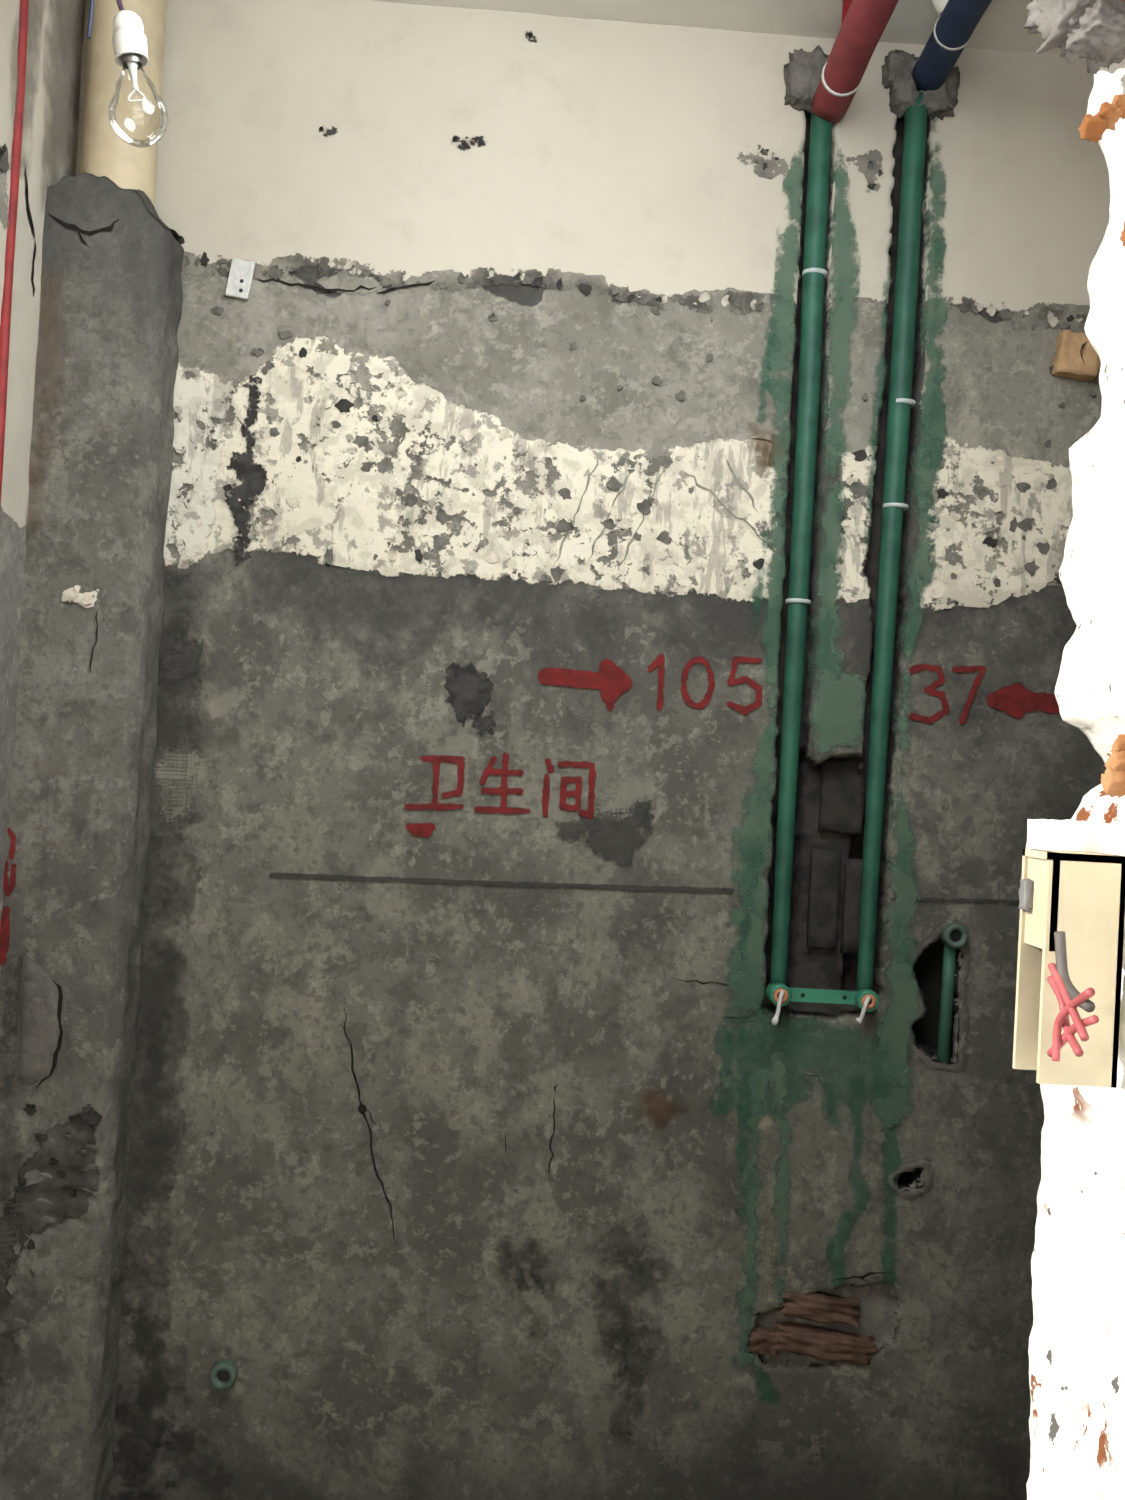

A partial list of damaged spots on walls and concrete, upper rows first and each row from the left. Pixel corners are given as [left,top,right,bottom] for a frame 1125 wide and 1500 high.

peeling [0,144,9,229]
crack [25,166,119,297]
peeling [164,252,795,602]
spalling [823,297,887,603]
peeling [917,296,1102,611]
spalling [0,1103,106,1295]
crack [341,1002,398,1246]